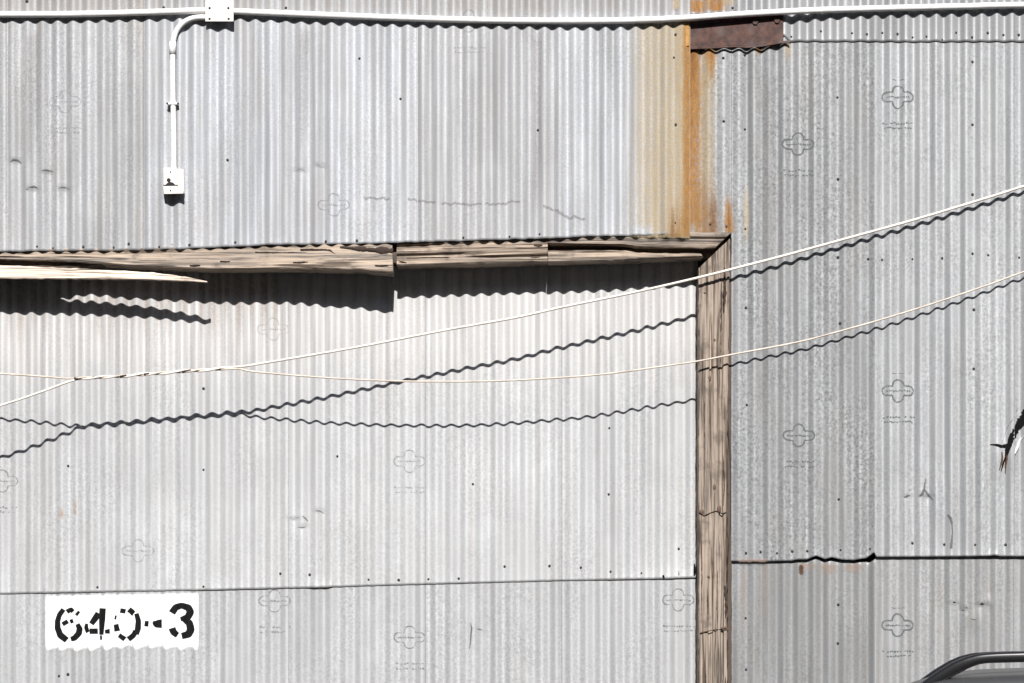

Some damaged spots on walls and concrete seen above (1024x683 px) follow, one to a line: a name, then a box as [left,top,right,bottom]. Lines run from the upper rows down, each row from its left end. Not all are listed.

corrosion [672,0,733,236]